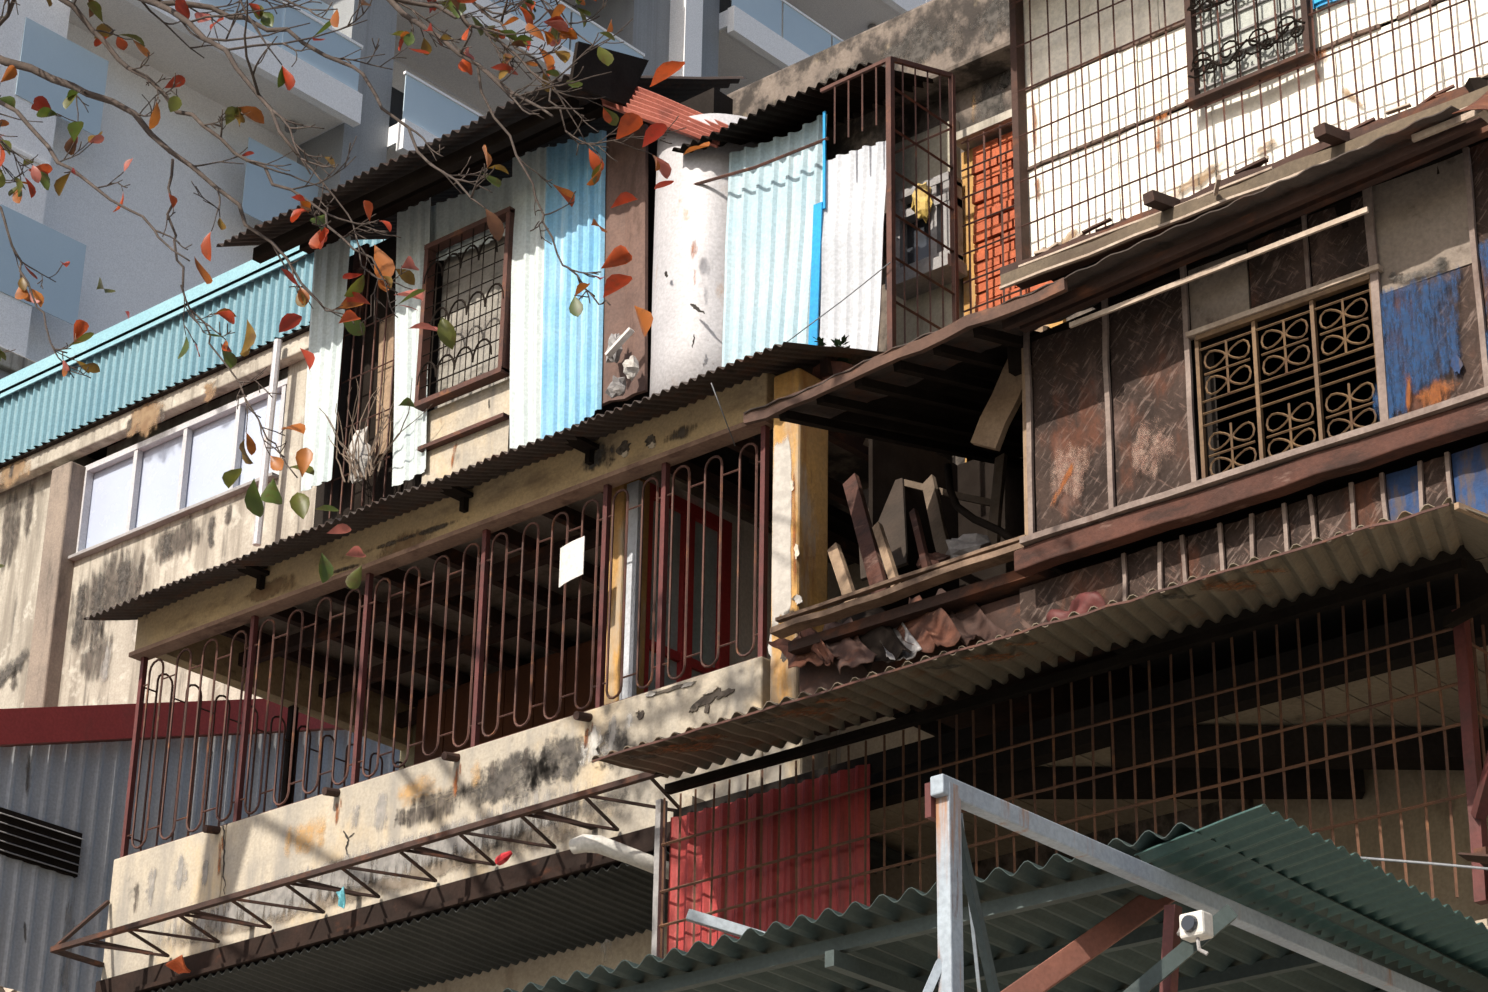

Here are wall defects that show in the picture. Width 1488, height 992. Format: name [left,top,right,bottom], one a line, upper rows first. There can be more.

leakage [884,0,1010,67]
leakage [977,69,1011,122]
rust [1452,91,1488,114]
peeling [1479,239,1488,282]
peeling [1373,268,1464,419]
leakage [0,458,34,569]
peeling [768,438,803,662]
leakage [70,504,231,680]
leakage [0,650,29,689]
spalling [635,681,735,720]
leakage [173,714,635,945]